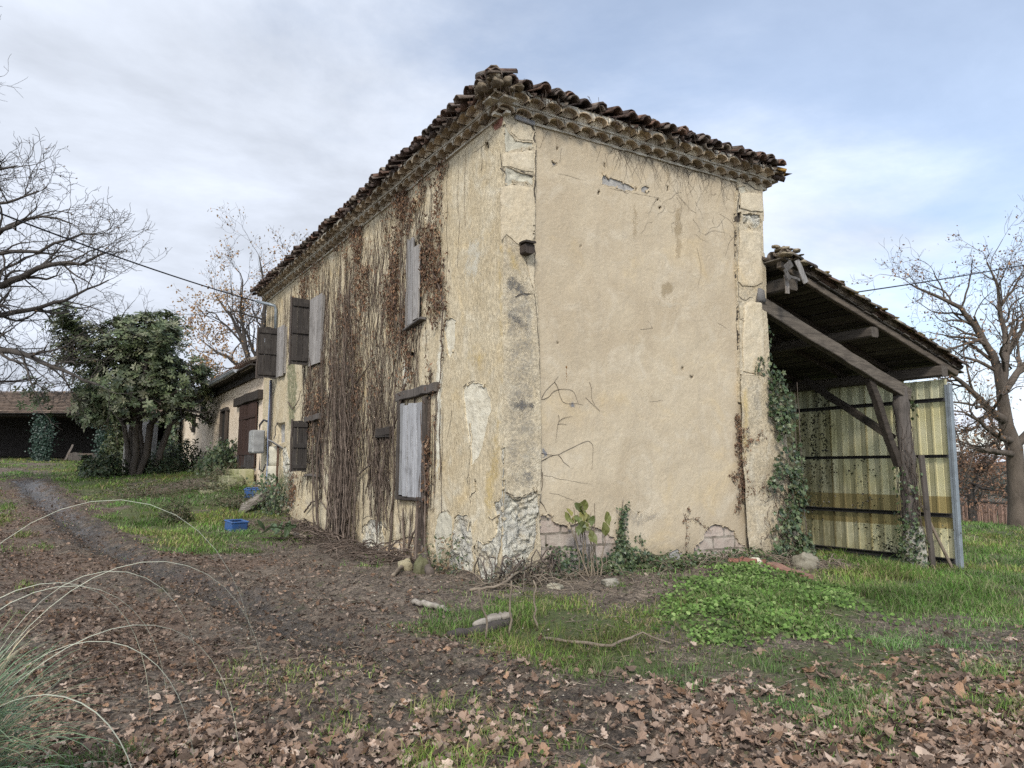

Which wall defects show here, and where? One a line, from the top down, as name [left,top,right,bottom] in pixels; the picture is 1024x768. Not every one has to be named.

spalling [597,162,669,209]
peeling [463,381,492,467]
spalling [447,444,627,579]
spalling [669,523,749,560]